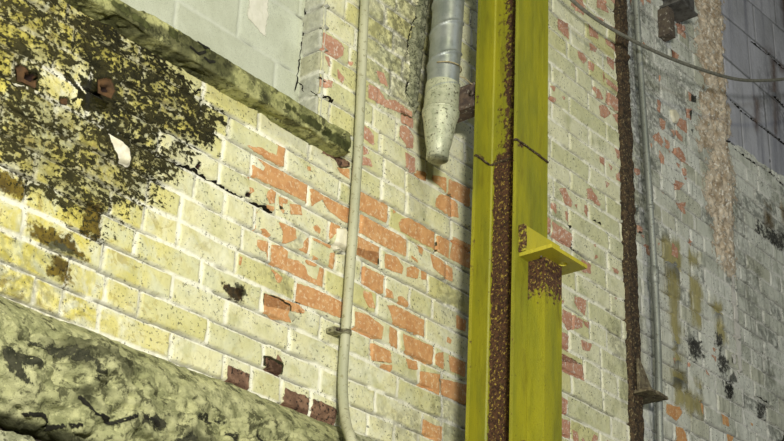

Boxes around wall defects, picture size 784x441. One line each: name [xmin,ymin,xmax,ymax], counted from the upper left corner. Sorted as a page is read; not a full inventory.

peeling [247,0,269,36]
crack [726,95,784,145]
damp [0,0,230,290]
damp [662,238,697,361]
damp [690,277,702,325]
damp [712,303,725,342]
damp [673,371,703,416]